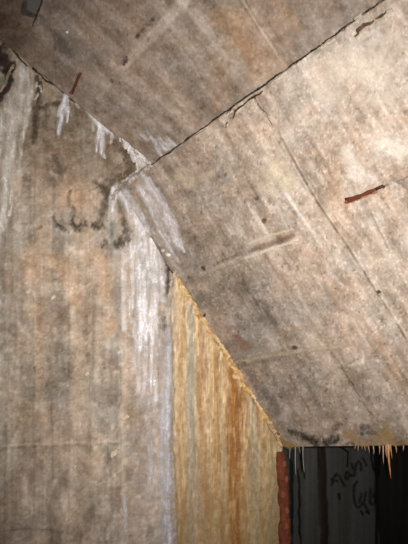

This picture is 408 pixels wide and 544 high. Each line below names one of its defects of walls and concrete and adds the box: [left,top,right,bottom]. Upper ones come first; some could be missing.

damp [0,63,37,232]
crack [12,50,80,109]
damp [54,95,70,134]
damp [93,118,113,158]
crack [152,0,395,165]
damp [110,135,185,405]
damp [160,343,171,445]
damp [160,453,172,544]
corrosion [229,368,241,544]